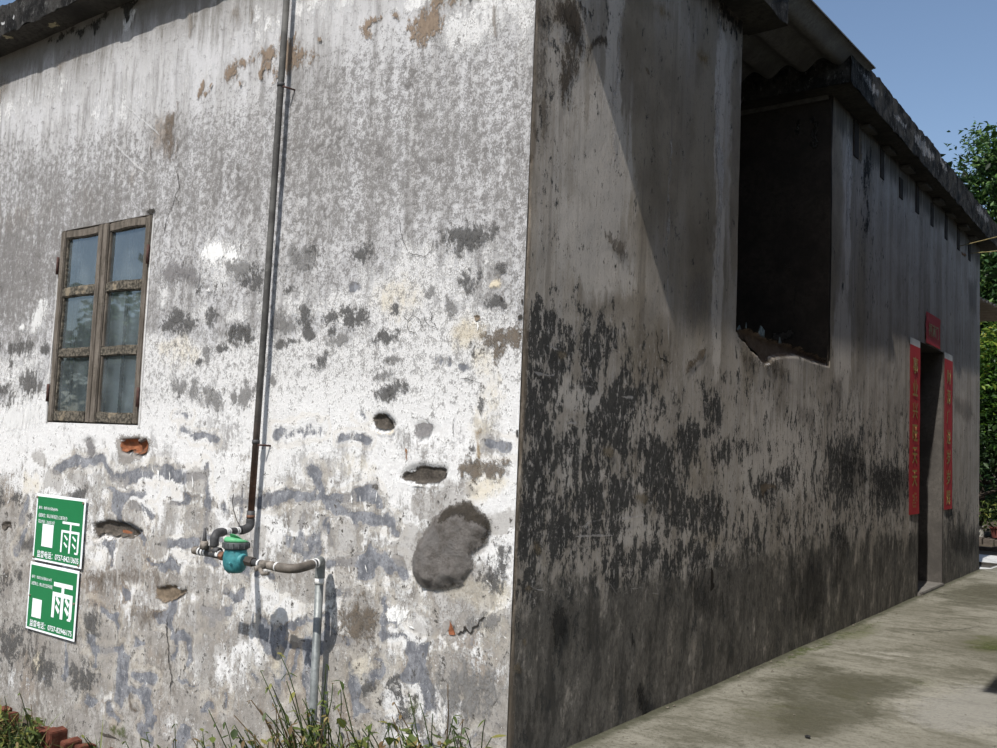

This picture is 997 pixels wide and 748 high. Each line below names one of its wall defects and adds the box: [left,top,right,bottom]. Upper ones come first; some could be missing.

flaking render [359,0,462,49]
flaking render [224,31,321,87]
damp [550,0,622,116]
flaking render [373,413,394,435]
flaking render [115,433,152,465]
damp [68,482,88,499]
flaking render [402,465,447,486]
flaking render [91,520,141,539]
damp [0,618,32,672]
damp [82,602,102,644]
damp [333,585,414,656]
damp [34,653,102,701]